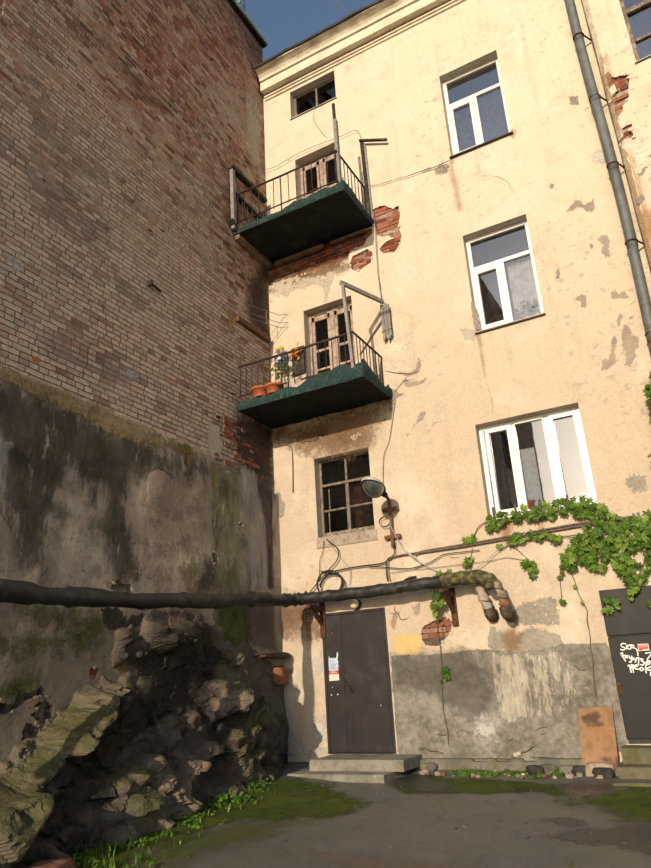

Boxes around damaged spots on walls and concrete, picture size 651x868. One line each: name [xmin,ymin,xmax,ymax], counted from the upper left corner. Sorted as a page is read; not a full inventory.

flaking render [606,72,630,116]
flaking render [618,124,636,149]
peeling [566,199,595,213]
corrosion [625,156,651,263]
flaking render [269,204,401,302]
peeling [602,314,639,370]
spalling [215,416,260,470]
damp [0,381,208,584]
flaking render [419,616,453,646]